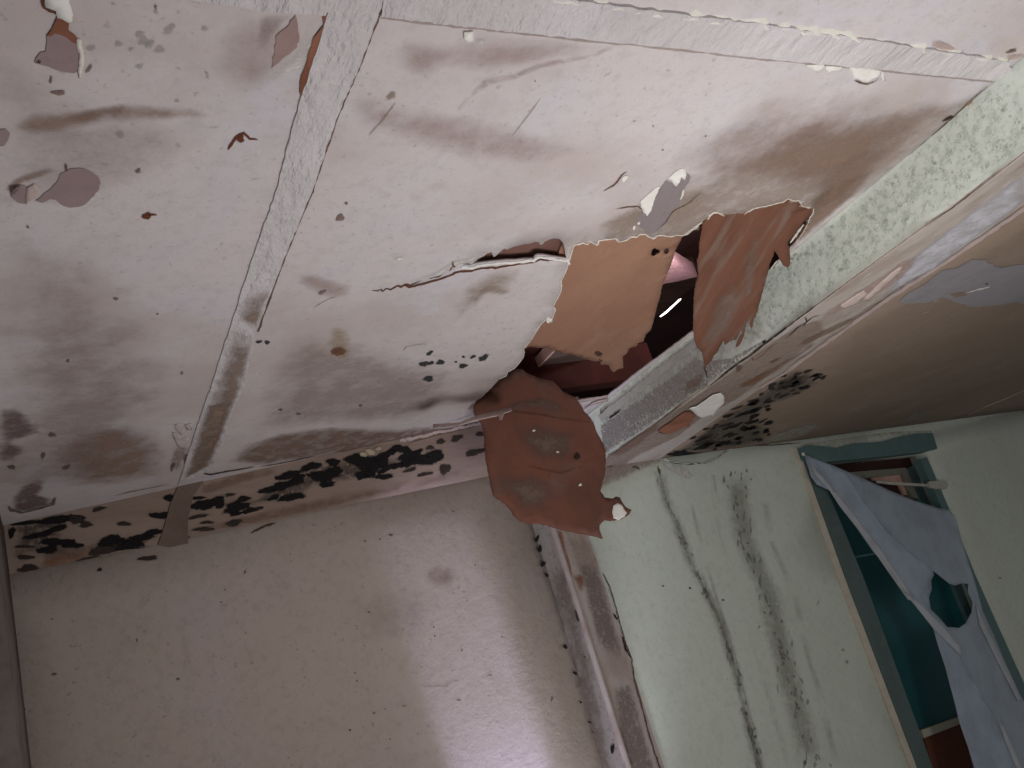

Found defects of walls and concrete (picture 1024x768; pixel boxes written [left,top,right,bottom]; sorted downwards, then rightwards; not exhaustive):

peeling [35,0,92,95]
peeling [267,15,326,95]
peeling [9,165,101,208]
leakage [28,111,125,130]
rust [228,132,257,150]
leakage [614,110,948,238]
crack [377,256,570,292]
peeling [742,207,1024,388]
peeling [616,393,724,455]
leakage [601,322,826,484]
leakage [188,429,485,538]
leakage [8,494,173,572]